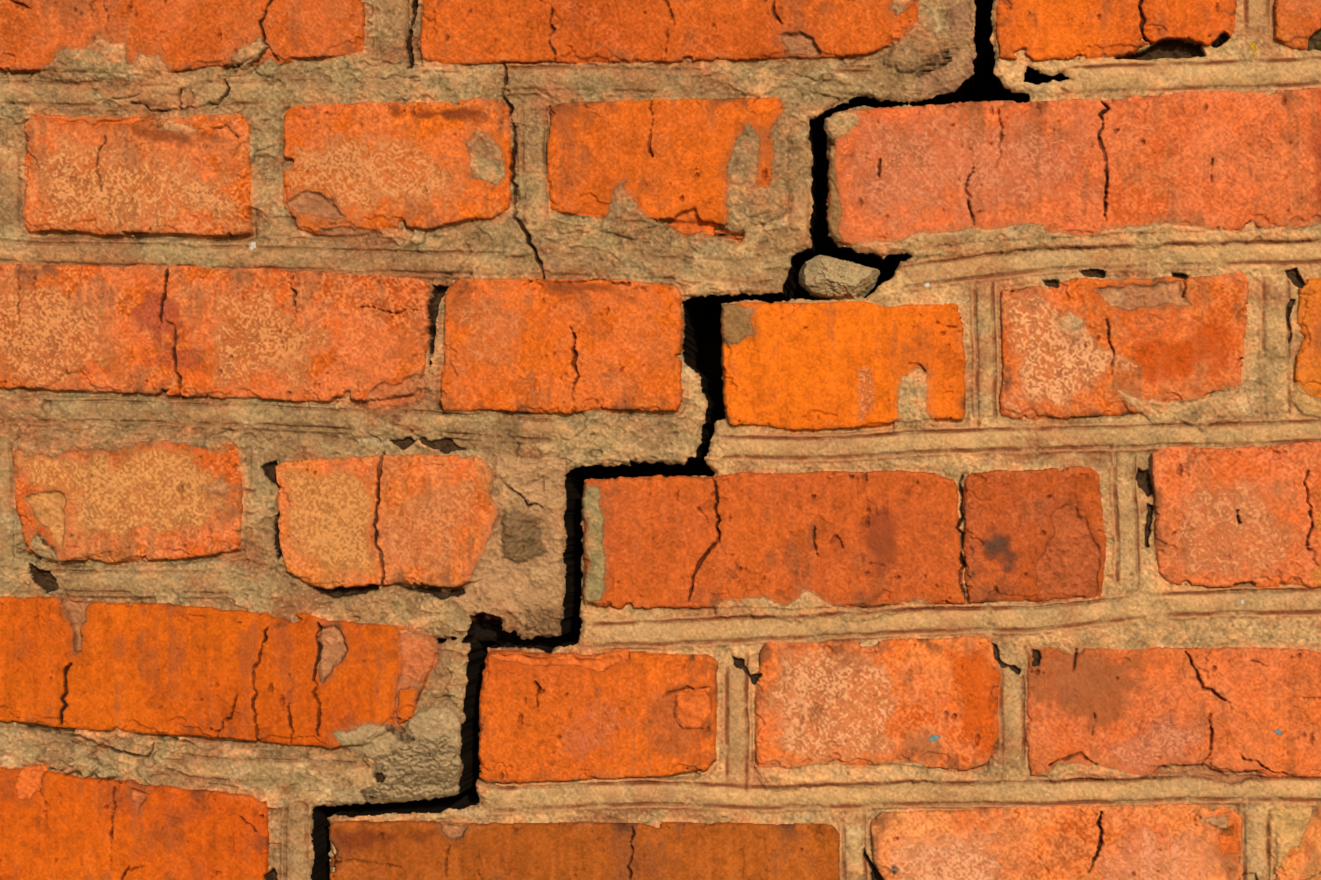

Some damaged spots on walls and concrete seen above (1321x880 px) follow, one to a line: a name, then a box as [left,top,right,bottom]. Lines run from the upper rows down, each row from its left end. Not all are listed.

crack [1098,104,1109,205]
spalling [667,208,745,242]
crack [160,269,177,364]
crack [311,0,1069,880]
spalling [25,491,66,549]
crack [223,629,268,740]
crack [290,624,323,736]
spalling [318,624,348,683]
spalling [393,628,438,734]
crack [1088,811,1102,872]